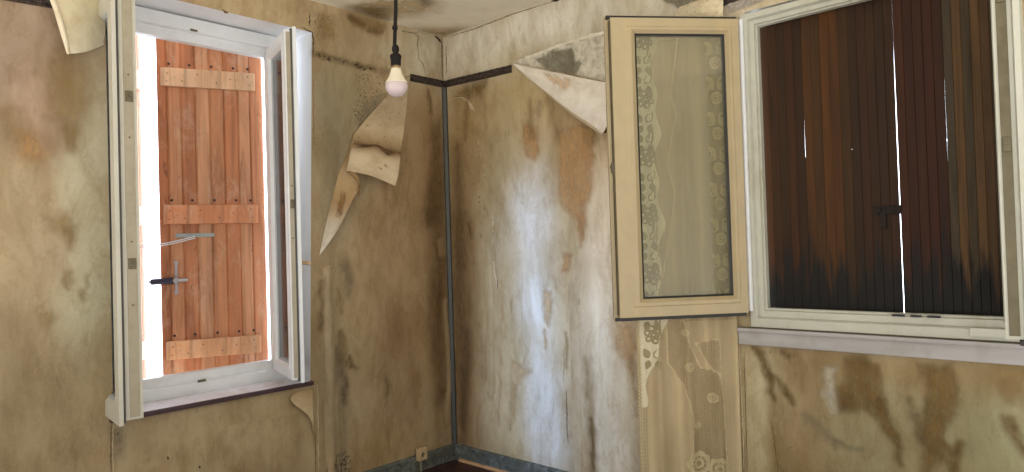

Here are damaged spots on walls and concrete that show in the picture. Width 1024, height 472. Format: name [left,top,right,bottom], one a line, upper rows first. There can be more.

flaking render [513,31,605,82]
leakage [553,106,594,233]
leakage [754,348,791,399]
leakage [838,359,900,459]
leakage [921,366,959,472]